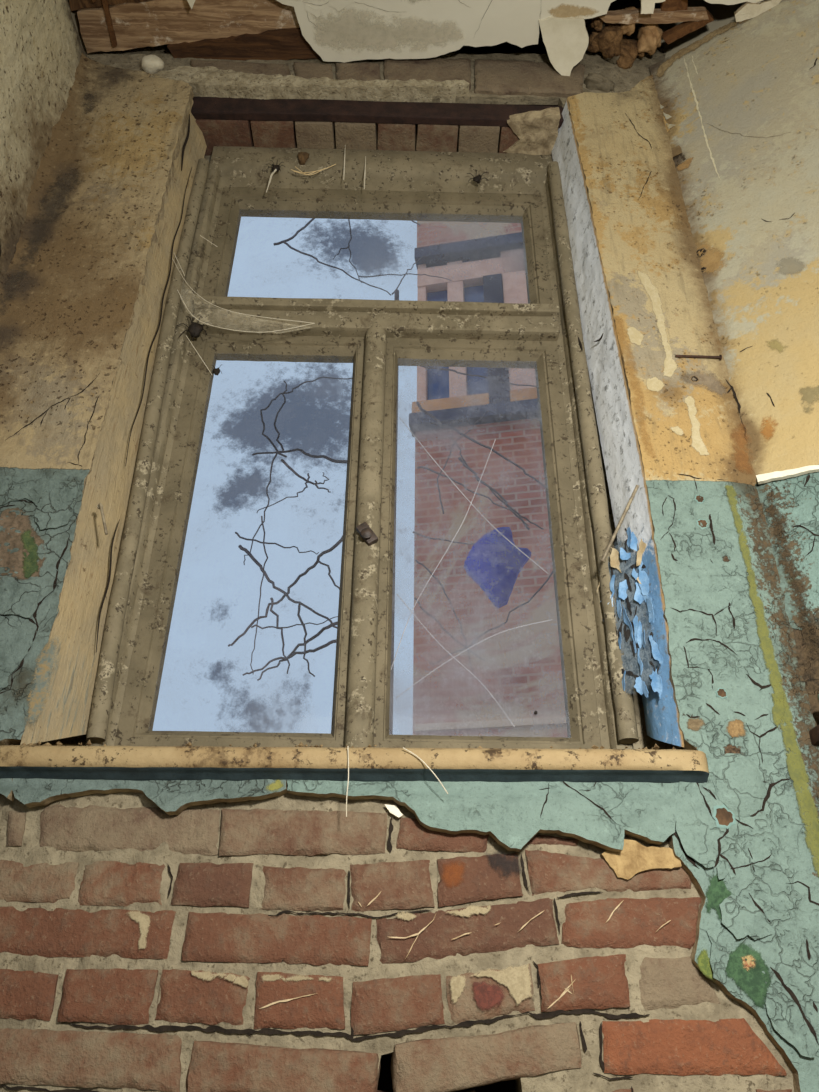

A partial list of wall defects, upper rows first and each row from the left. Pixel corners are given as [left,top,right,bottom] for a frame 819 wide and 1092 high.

crack [6,373,100,466]
peeling [627,327,644,346]
peeling [637,270,726,455]
crack [660,474,723,563]
flaking render [756,465,819,484]
flaking render [0,507,59,723]
crack [0,536,70,694]
peeling [597,527,663,699]
crack [670,603,791,923]
flaking render [0,778,819,1058]
crack [788,881,819,905]
crack [770,967,819,1045]